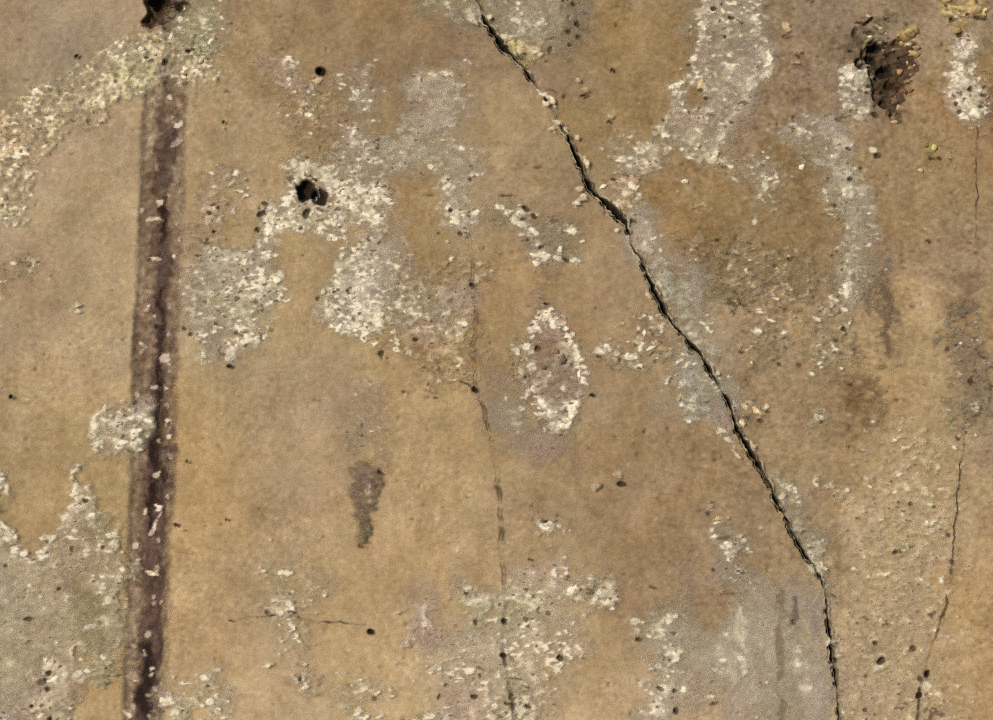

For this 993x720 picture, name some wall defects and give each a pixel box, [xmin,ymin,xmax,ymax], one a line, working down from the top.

spalling [838,13,921,124]
spalling [943,33,990,129]
peeling [151,66,496,398]
peeling [88,386,171,454]
crack [461,263,488,430]
spalling [506,294,674,436]
crack [468,6,840,720]
peeling [143,495,169,543]
water stain [347,461,383,547]
peeling [0,464,146,720]
spalling [486,680,544,720]
crack [916,671,929,720]